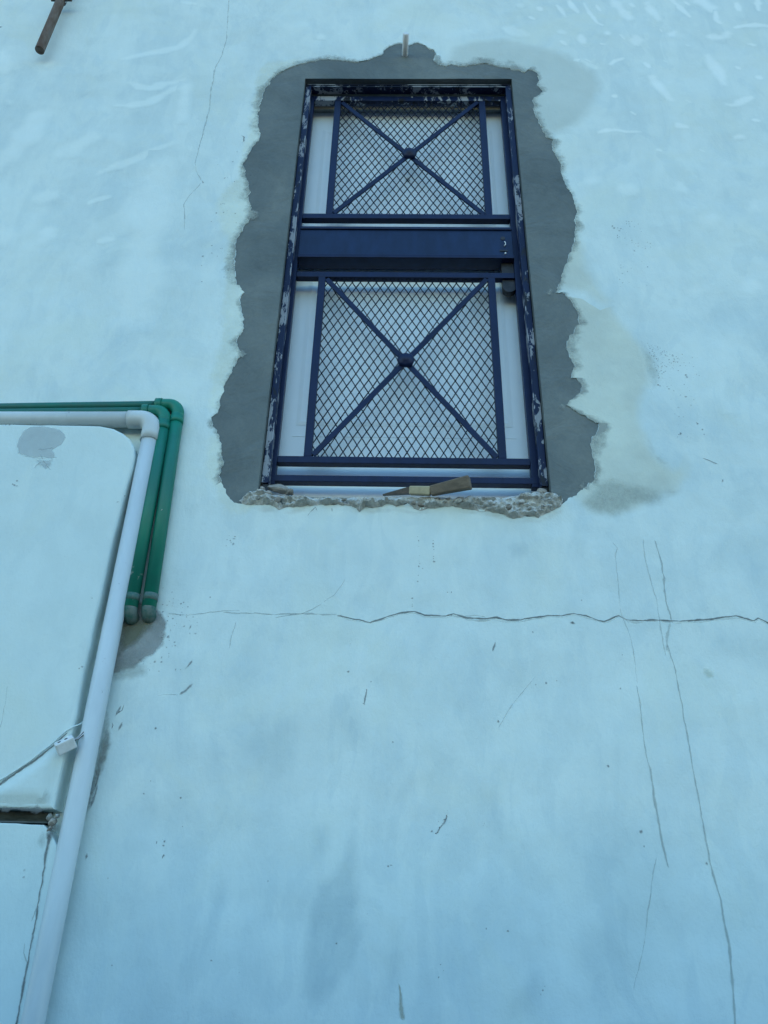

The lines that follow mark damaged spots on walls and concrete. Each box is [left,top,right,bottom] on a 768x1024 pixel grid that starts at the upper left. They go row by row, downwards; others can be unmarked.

water stain [549,197,714,524]
water stain [201,429,261,518]
spalling [239,489,563,519]
crack [339,611,768,624]